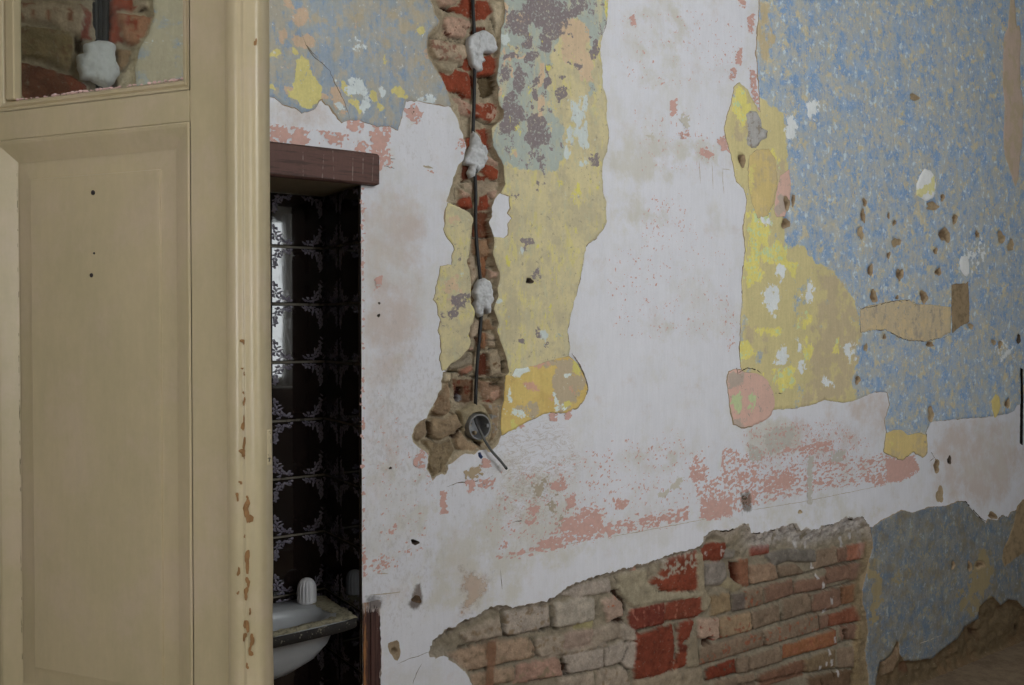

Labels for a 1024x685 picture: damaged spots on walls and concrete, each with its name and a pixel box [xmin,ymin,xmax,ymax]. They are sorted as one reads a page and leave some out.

crack [302,35,349,114]
peeling [254,0,1024,685]
peeling [236,481,254,669]